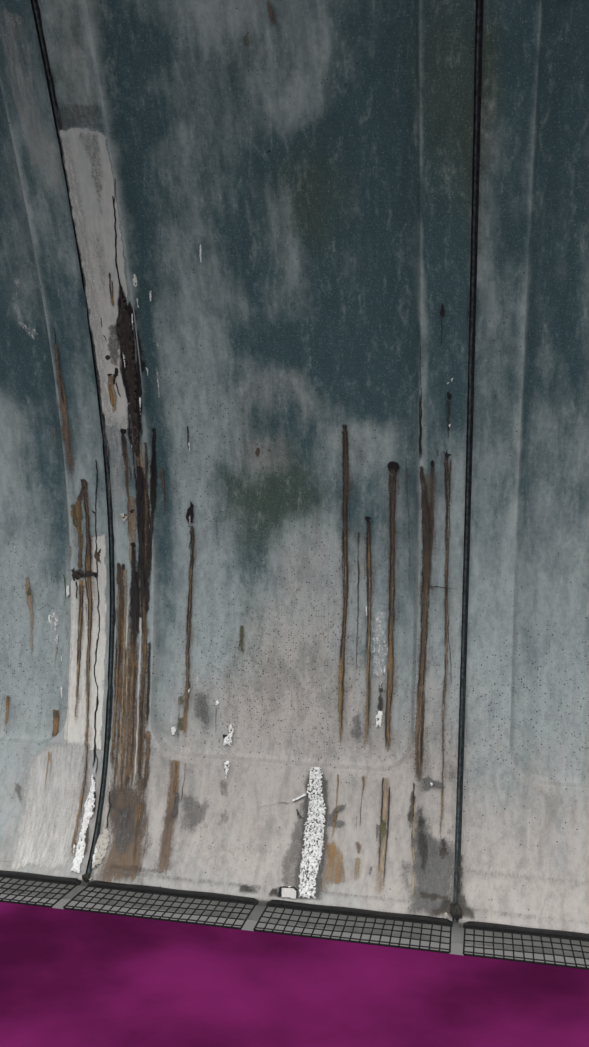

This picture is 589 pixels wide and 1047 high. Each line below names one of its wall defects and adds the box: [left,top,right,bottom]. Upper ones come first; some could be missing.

peeling [59,127,157,633]
rust [54,328,93,849]
rust [110,429,151,793]
rust [177,526,194,735]
rust [338,425,373,741]
rust [385,396,451,828]
rust [159,760,179,872]
rust [326,775,390,890]